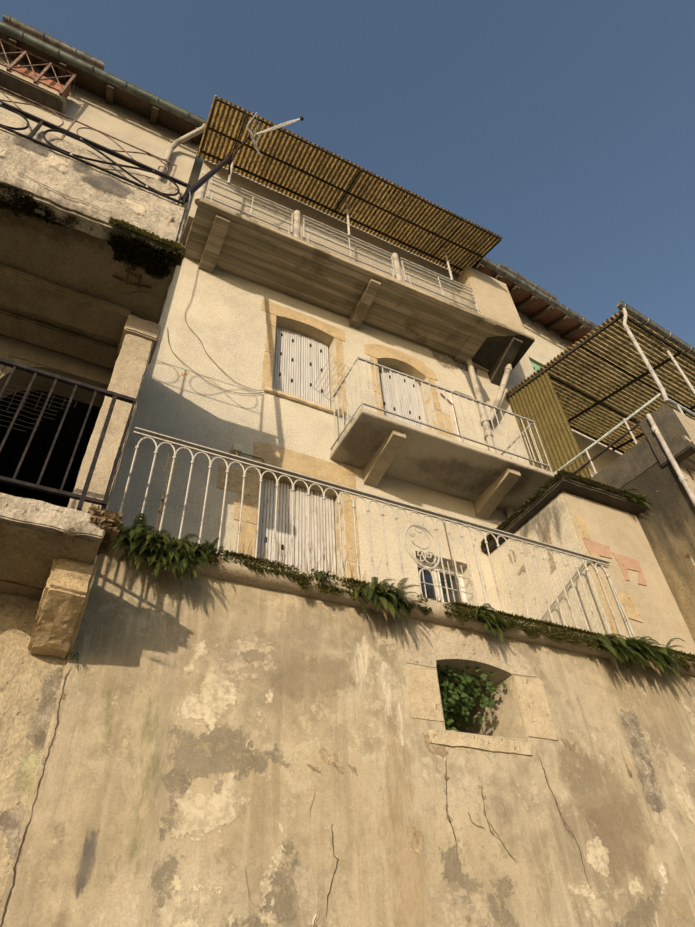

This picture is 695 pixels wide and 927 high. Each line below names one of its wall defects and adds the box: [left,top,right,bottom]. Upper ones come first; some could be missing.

peeling [173,630,277,735]
crack [0,668,71,927]
peeling [167,772,246,845]
crack [444,758,515,862]
crack [537,753,591,887]
peeling [160,872,223,927]
peeling [258,821,287,927]
crack [311,823,339,927]